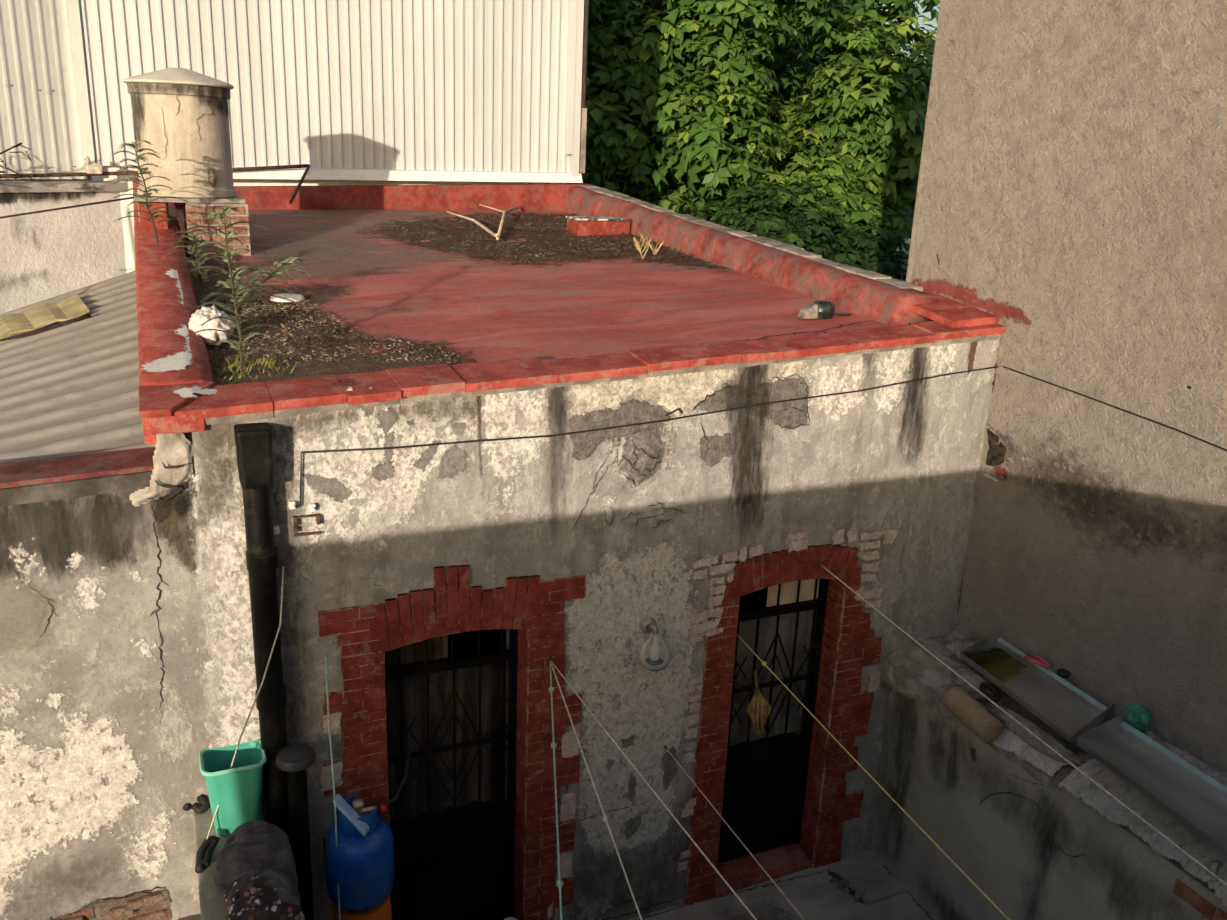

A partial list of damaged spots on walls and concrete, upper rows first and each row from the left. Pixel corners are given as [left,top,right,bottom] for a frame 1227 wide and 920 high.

leakage [0,424,235,618]
peeling [0,433,261,920]
crack [149,506,176,724]
crack [570,452,617,534]
peeling [263,343,977,582]
leakage [725,364,769,518]
peeling [831,527,899,608]
leakage [900,347,927,453]